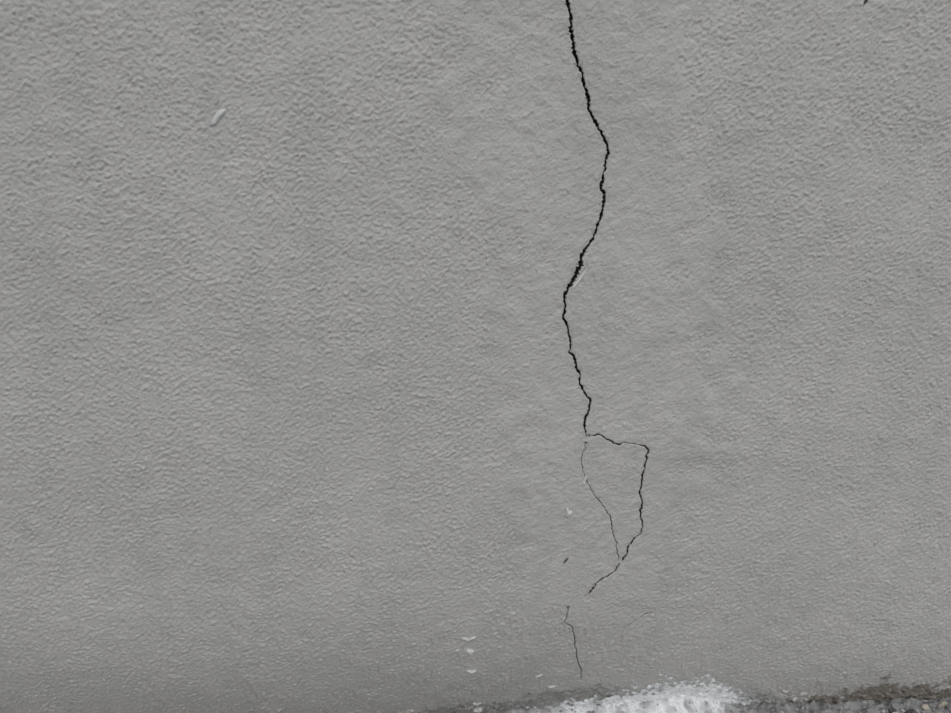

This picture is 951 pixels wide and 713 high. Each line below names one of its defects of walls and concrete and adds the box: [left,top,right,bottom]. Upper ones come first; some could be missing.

crack [559,0,653,680]